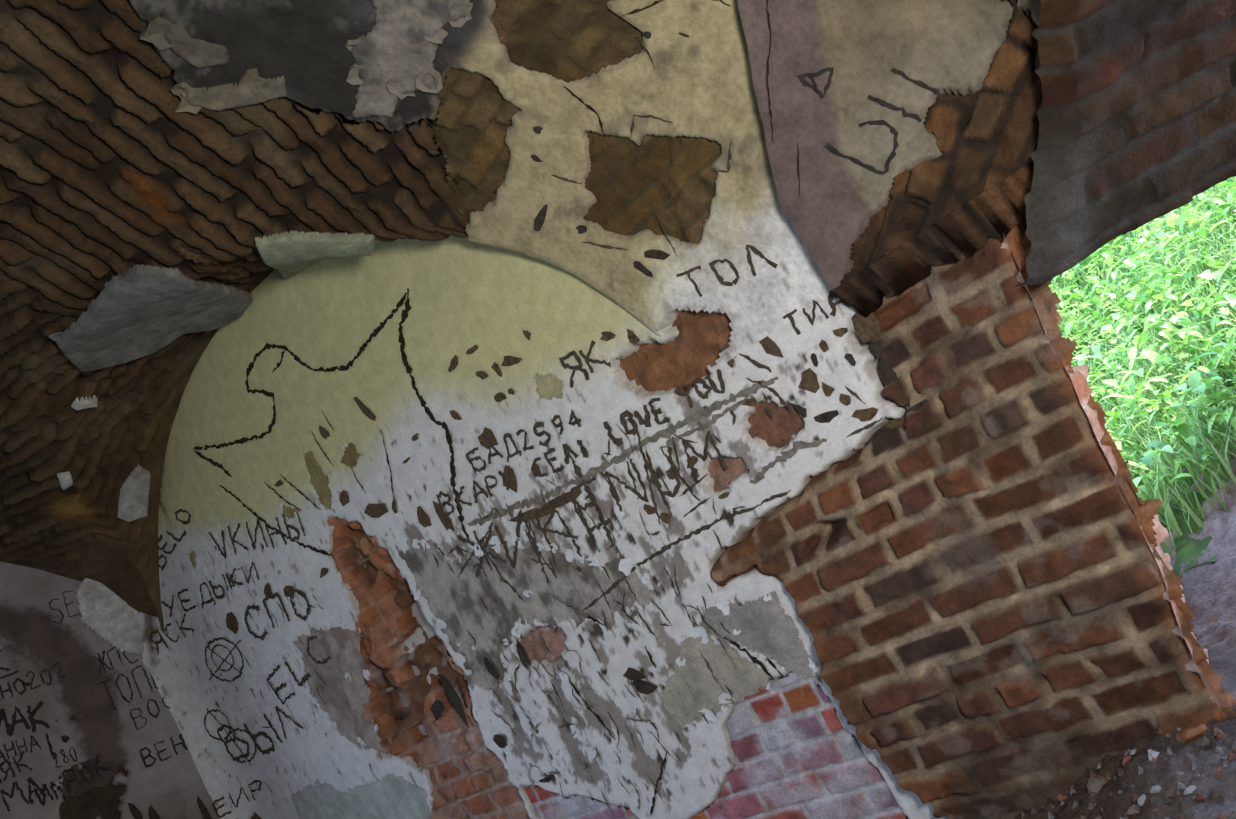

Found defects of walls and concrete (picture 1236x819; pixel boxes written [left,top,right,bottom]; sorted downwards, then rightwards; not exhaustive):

spalling [491,0,651,83]
spalling [533,204,548,231]
spalling [575,131,722,278]
spalling [0,0,522,634]
peeling [534,372,563,402]
spalling [600,309,736,392]
spalling [623,0,1236,819]
spalling [292,451,654,819]
spalling [53,760,161,819]
spalling [197,796,212,819]